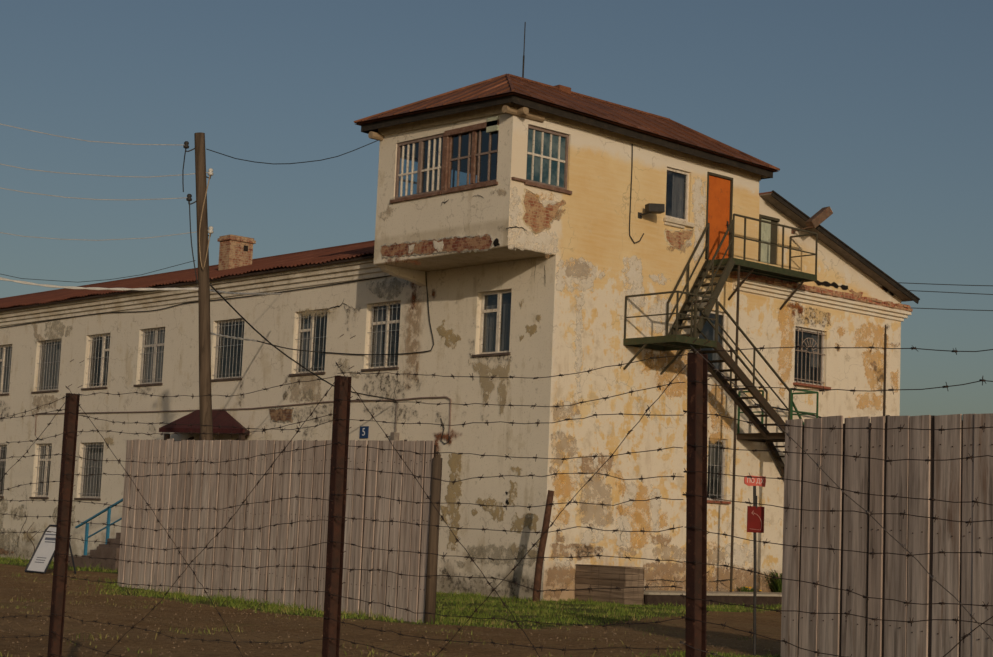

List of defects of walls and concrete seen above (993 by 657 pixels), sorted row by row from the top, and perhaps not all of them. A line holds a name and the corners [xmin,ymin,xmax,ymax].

flaking render [380,187,605,292]
peeling [664,177,706,261]
peeling [437,320,461,349]
water stain [473,362,510,414]
peeling [519,315,541,341]
peeling [622,255,672,333]
peeling [644,350,689,397]
peeling [778,304,900,409]
peeling [440,453,539,557]
flaking render [545,401,686,598]